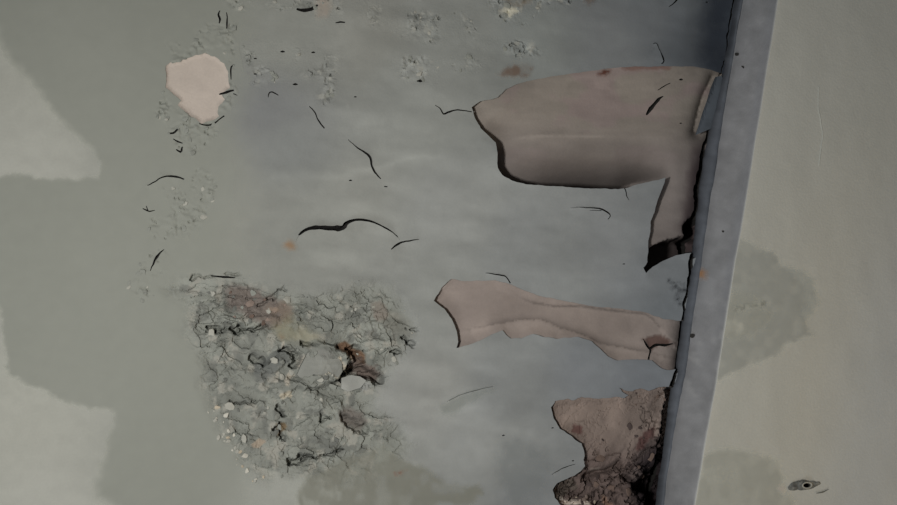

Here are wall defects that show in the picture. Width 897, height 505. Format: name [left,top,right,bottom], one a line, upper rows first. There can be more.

peeling [165,53,230,124]
crack [348,139,387,187]
crack [435,105,472,115]
flaking render [472,66,722,272]
leakage [0,0,243,505]
spalling [165,269,423,496]
crack [298,218,419,250]
flaking render [434,279,684,370]
crack [643,130,709,505]
leakage [717,240,817,380]
leakage [298,447,483,505]
flaking render [551,386,673,505]